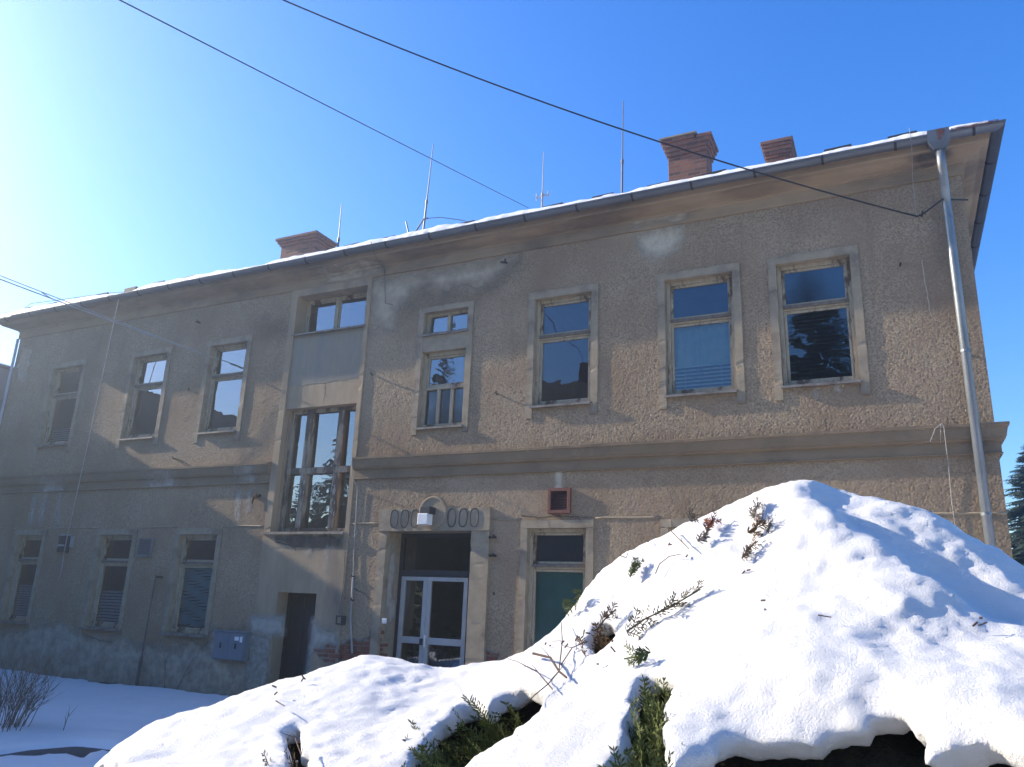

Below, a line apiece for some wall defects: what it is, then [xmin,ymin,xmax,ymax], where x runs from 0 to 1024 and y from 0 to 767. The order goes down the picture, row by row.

flaking render [312,548,396,664]